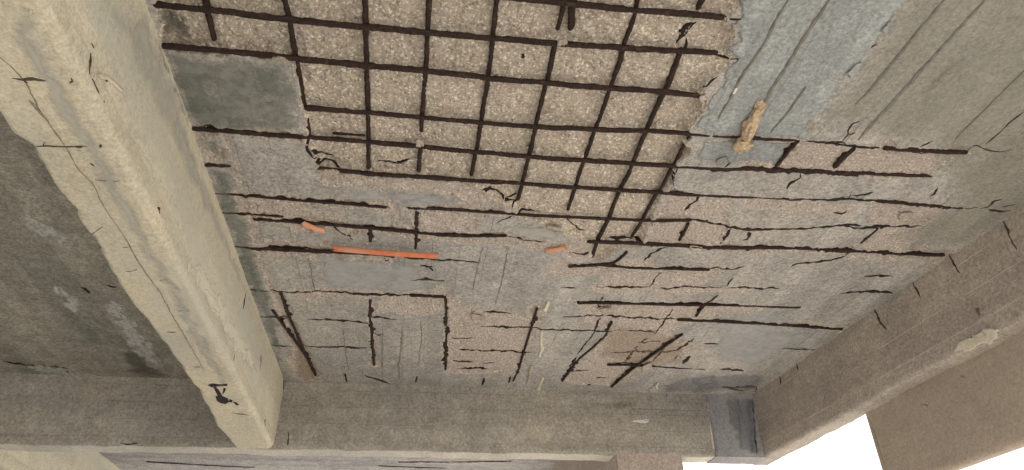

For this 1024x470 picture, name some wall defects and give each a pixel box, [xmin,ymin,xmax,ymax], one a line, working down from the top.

crack [12,43,99,93]
crack [36,142,120,182]
peeling [153,0,974,390]
crack [243,257,478,384]
crack [453,247,814,453]
crack [841,274,921,330]